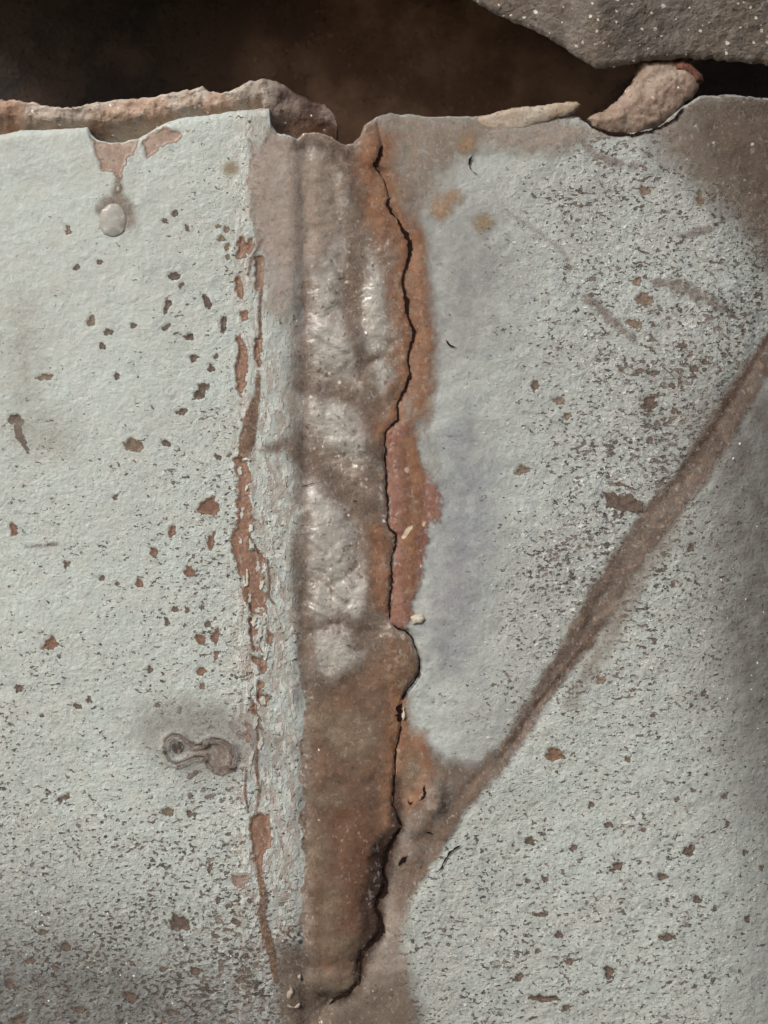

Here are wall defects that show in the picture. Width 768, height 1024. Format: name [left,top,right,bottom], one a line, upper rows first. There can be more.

peeling [89,126,182,178]
peeling [477,102,581,131]
peeling [162,298,193,340]
peeling [190,353,218,399]
peeling [220,315,264,397]
peeling [7,413,30,454]
peeling [197,496,220,517]
corrosion [251,0,768,989]
peeling [164,605,219,689]
peeling [214,452,274,765]
crack [330,145,460,1004]
peeling [231,812,273,889]